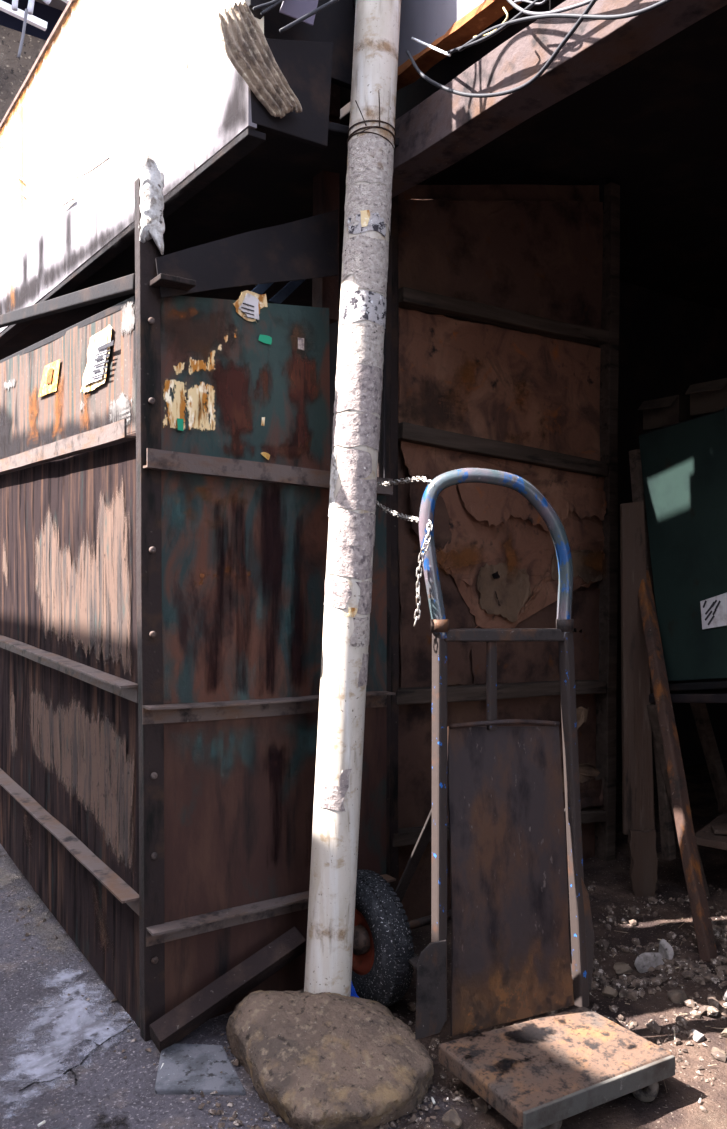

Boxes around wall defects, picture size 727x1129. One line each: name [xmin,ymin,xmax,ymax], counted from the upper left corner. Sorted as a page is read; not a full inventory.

rust [161,308,320,458]
rust [208,501,247,690]
rust [261,486,306,692]
peeling [434,483,558,628]
peeling [401,441,607,591]